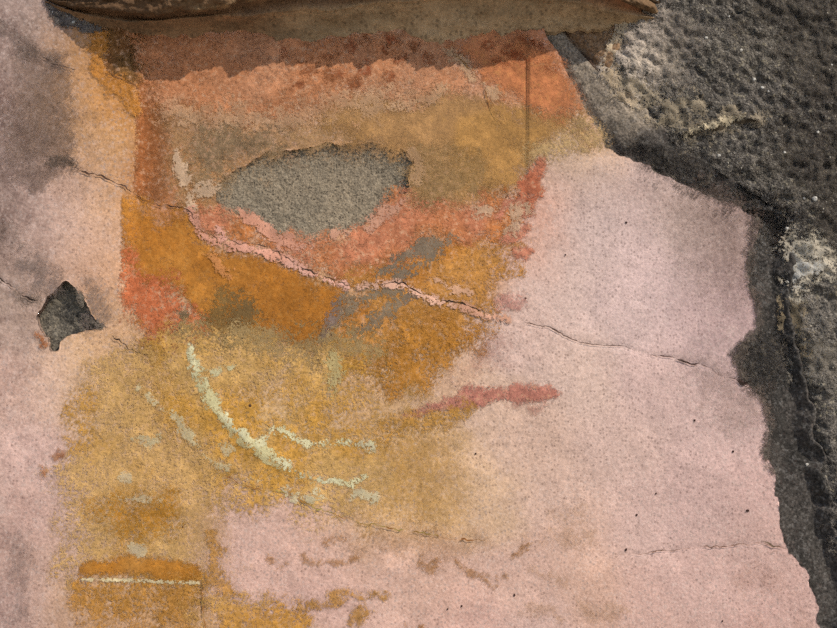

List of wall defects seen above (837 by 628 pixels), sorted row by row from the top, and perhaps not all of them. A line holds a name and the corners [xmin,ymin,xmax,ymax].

corrosion [87,29,142,116]
spalling [596,3,772,153]
spalling [39,282,106,351]
spalling [172,143,547,281]
crack [57,162,752,388]
spalling [772,225,837,358]
corrosion [302,552,358,566]
crack [621,541,786,555]